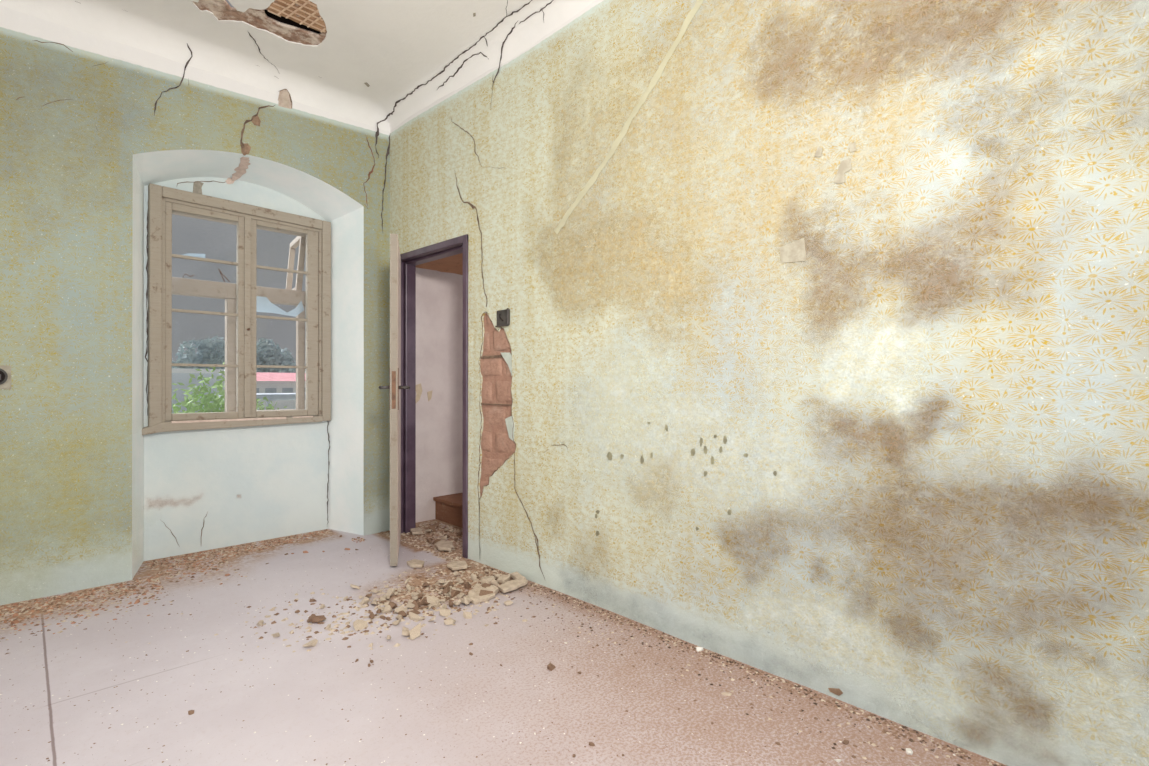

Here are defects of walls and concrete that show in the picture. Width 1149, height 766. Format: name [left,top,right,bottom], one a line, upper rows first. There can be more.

crack [154,44,192,115]
spalling [193,0,327,45]
crack [240,32,280,153]
crack [363,0,553,231]
crack [451,119,504,307]
water stain [543,84,852,321]
water stain [887,209,999,304]
spalling [478,312,516,500]
water stain [579,374,803,498]
water stain [825,321,930,464]
crack [514,452,545,579]
water stain [744,598,901,682]